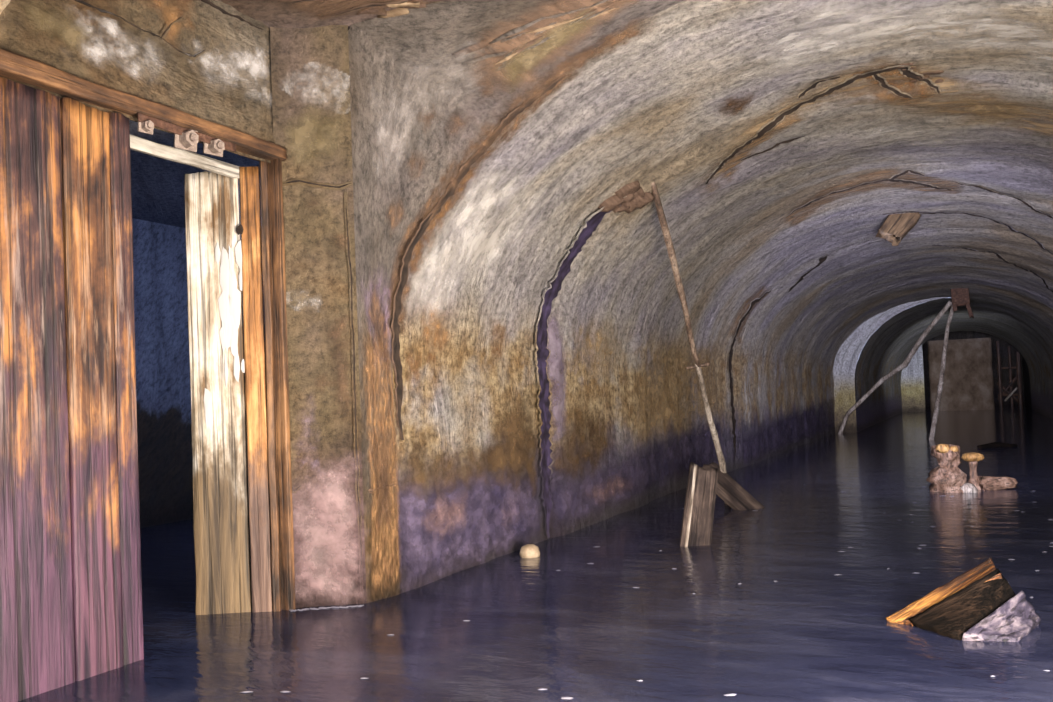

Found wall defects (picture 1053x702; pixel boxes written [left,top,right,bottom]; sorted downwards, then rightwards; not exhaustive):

crack [63,0,268,61]
spalling [297,0,428,18]
spalling [451,0,635,93]
crack [705,65,941,184]
crack [787,169,1053,292]
rust [366,24,640,586]
crack [534,196,626,538]
damp [547,319,722,518]
damp [742,382,834,462]
damp [296,470,357,594]
damp [403,404,539,573]